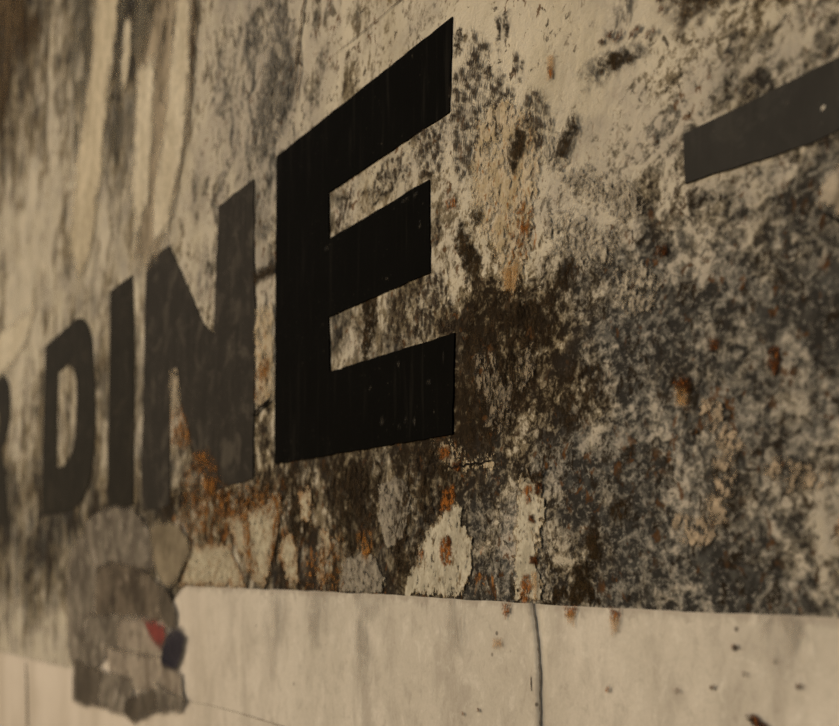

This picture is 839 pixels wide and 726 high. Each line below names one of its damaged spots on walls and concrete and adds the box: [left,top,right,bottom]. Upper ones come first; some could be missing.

corrosion [598,24,655,46]
leakage [71,0,93,154]
leakage [451,219,483,279]
leakage [361,273,453,361]
leakage [459,251,586,455]
corrosion [169,368,190,449]
leakage [556,361,609,427]
leakage [545,525,602,606]
crack [530,600,541,726]
corrosion [747,714,767,726]